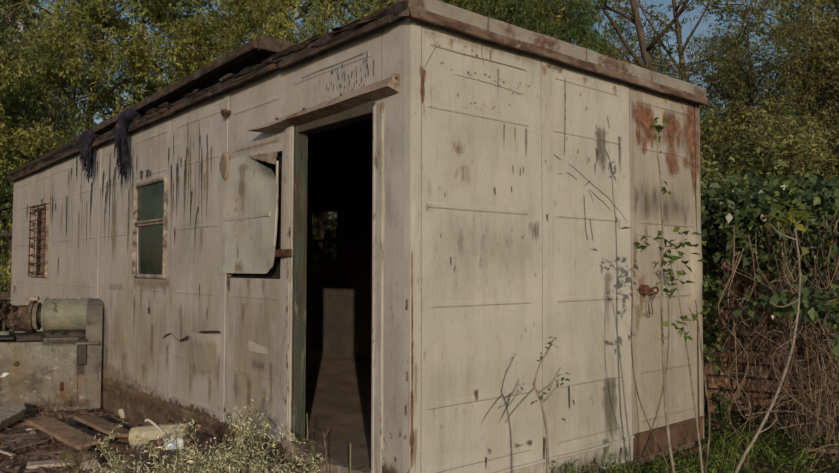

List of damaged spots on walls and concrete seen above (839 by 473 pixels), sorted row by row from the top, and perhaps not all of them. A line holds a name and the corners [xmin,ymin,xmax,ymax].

water stain [65,151,151,238]
water stain [168,127,212,229]
water stain [595,130,605,171]
corrosion [633,89,705,191]